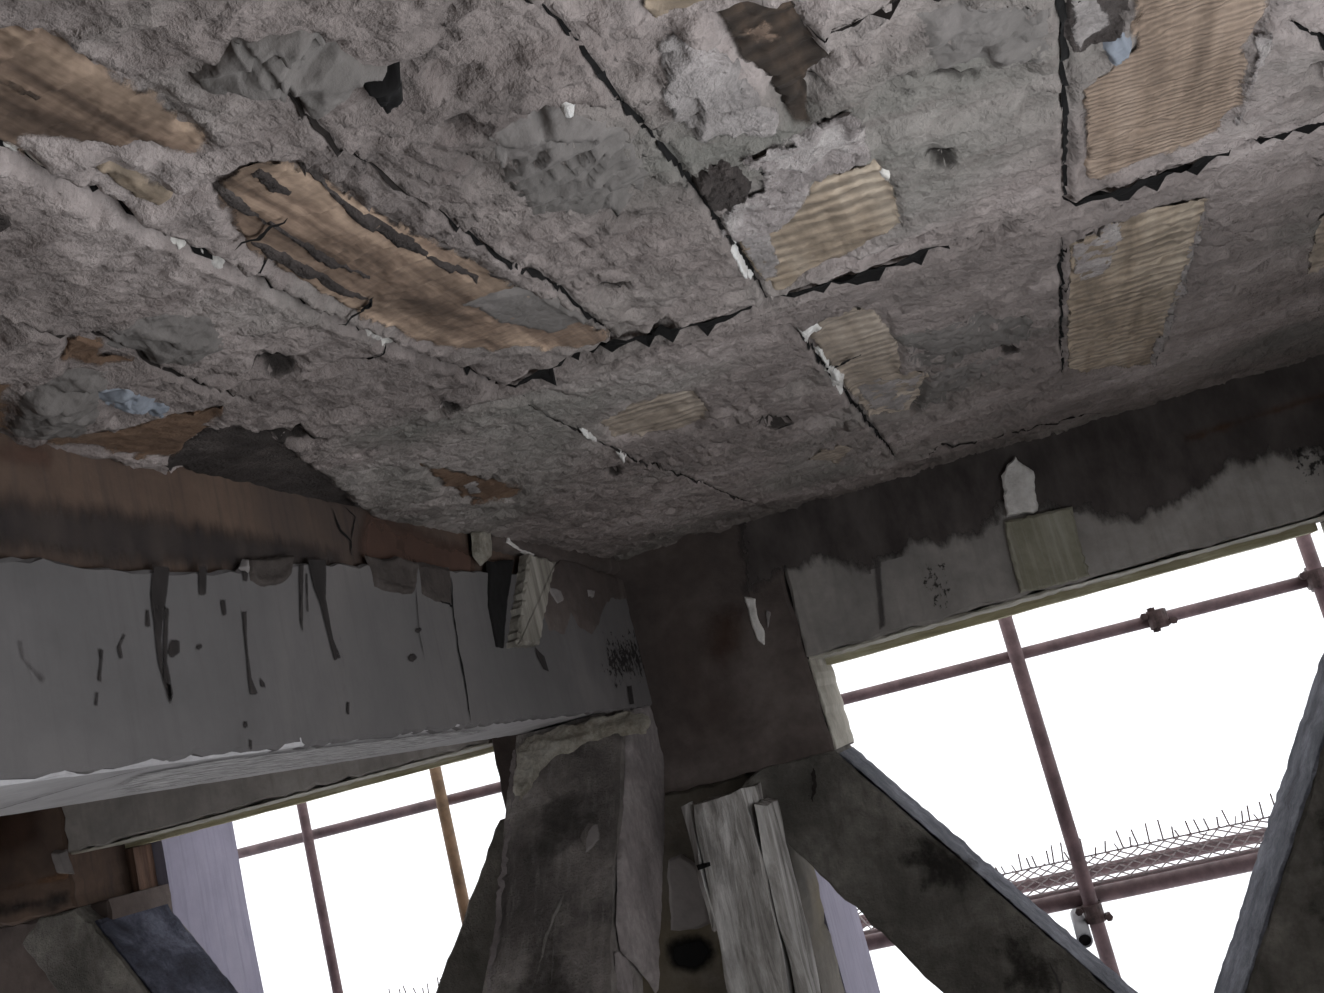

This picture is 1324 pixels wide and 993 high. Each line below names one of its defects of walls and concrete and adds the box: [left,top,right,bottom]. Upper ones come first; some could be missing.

peeling [0,26,210,206]
crack [89,185,137,219]
crack [26,324,236,397]
crack [170,237,225,269]
peeling [212,161,610,352]
crack [287,0,1100,504]
peeling [658,1,901,290]
peeling [810,307,930,417]
peeling [1066,198,1207,374]
peeling [1059,0,1273,180]
crack [1056,0,1324,206]
leakage [0,498,341,705]